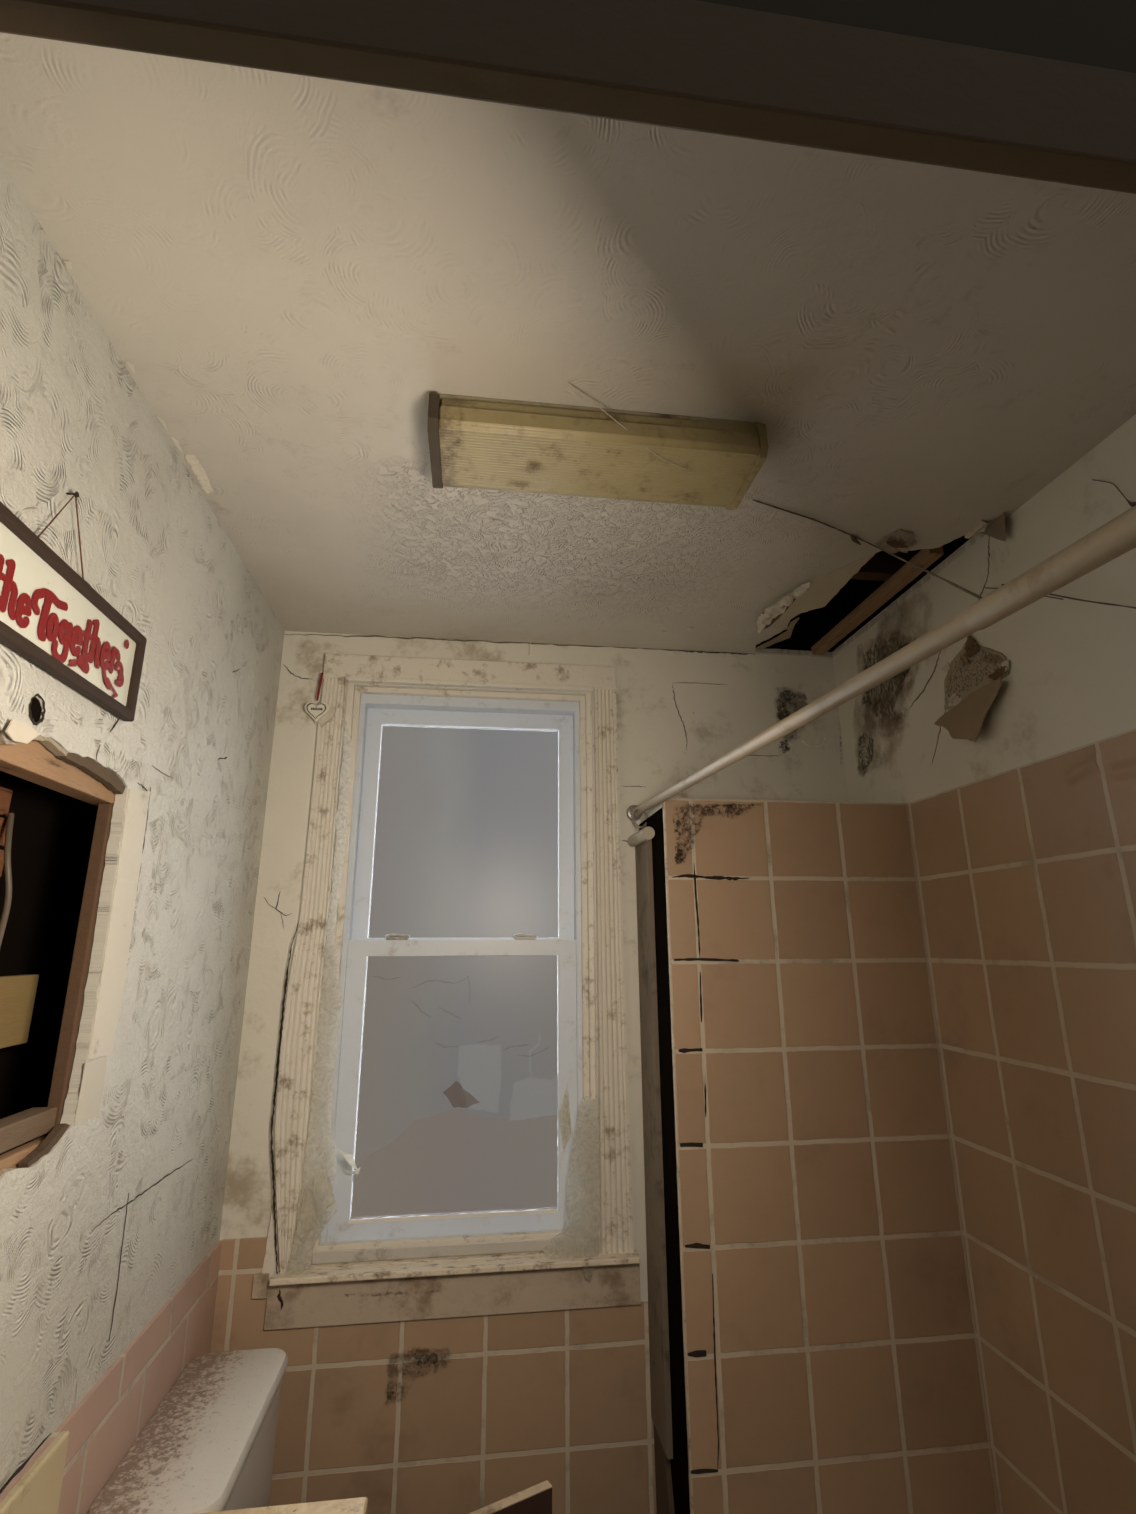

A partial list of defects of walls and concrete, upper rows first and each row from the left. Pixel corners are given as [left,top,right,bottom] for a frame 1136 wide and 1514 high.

spalling [875,529,917,554]
peeling [978,512,1006,600]
leakage [863,607,909,670]
mould [777,690,810,753]
leakage [840,734,874,777]
leakage [862,668,910,723]
spalling [909,635,1010,763]
hole [0,719,150,1176]
crack [264,893,299,1309]
crack [92,1159,193,1340]